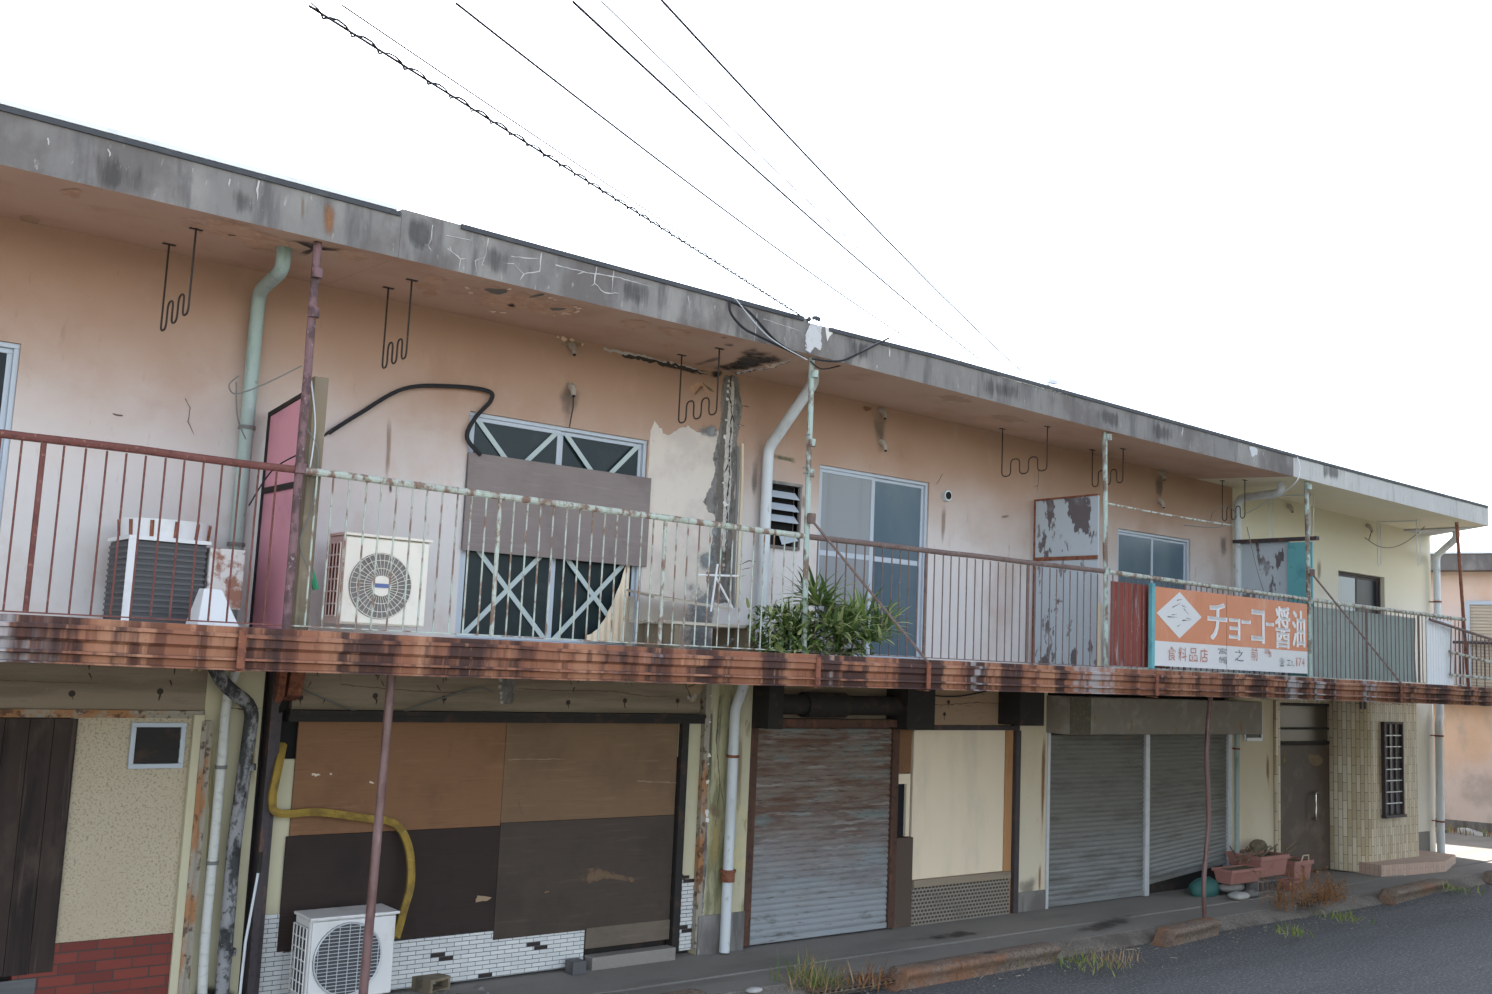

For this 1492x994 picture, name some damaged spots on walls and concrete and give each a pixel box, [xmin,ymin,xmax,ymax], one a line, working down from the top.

damp [667,349,778,377]
peeling [640,375,743,650]